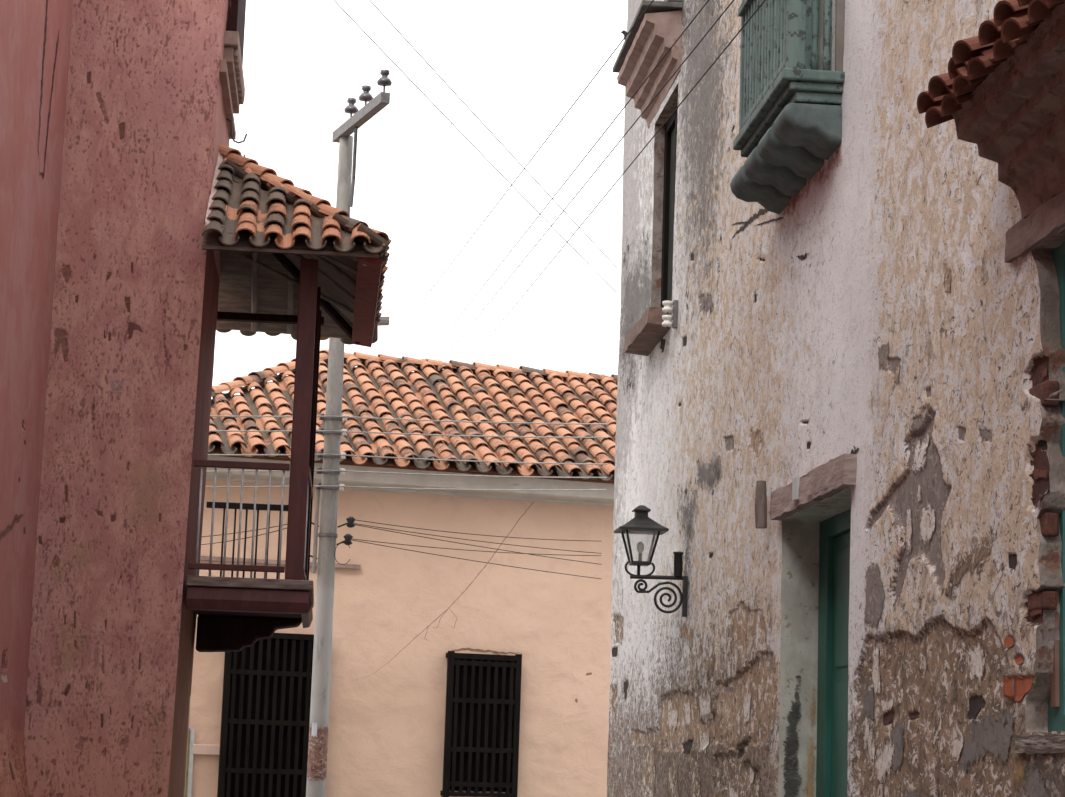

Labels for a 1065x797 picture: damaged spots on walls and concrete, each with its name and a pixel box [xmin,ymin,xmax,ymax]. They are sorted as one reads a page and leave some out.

crack [38,0,59,179]
flaking render [878,340,901,383]
flaking render [1029,355,1049,387]
flaking render [1029,440,1050,510]
crack [0,514,24,539]
flaking render [849,387,1033,797]
flaking render [1024,590,1060,642]
flaking render [630,598,778,797]